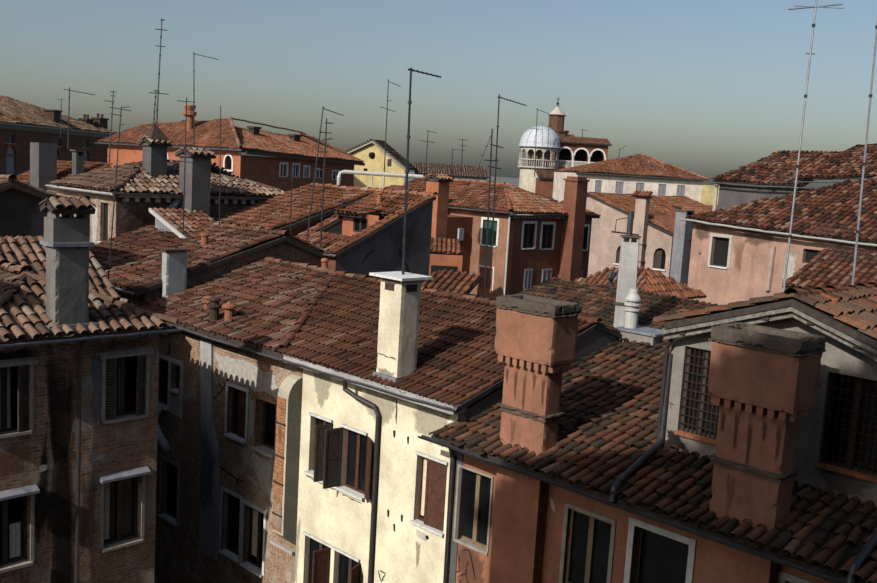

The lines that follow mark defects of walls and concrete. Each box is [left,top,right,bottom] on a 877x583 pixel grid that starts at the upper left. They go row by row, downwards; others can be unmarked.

water stain [34,363,73,583]
peeling [213,352,281,527]
crack [448,549,476,583]